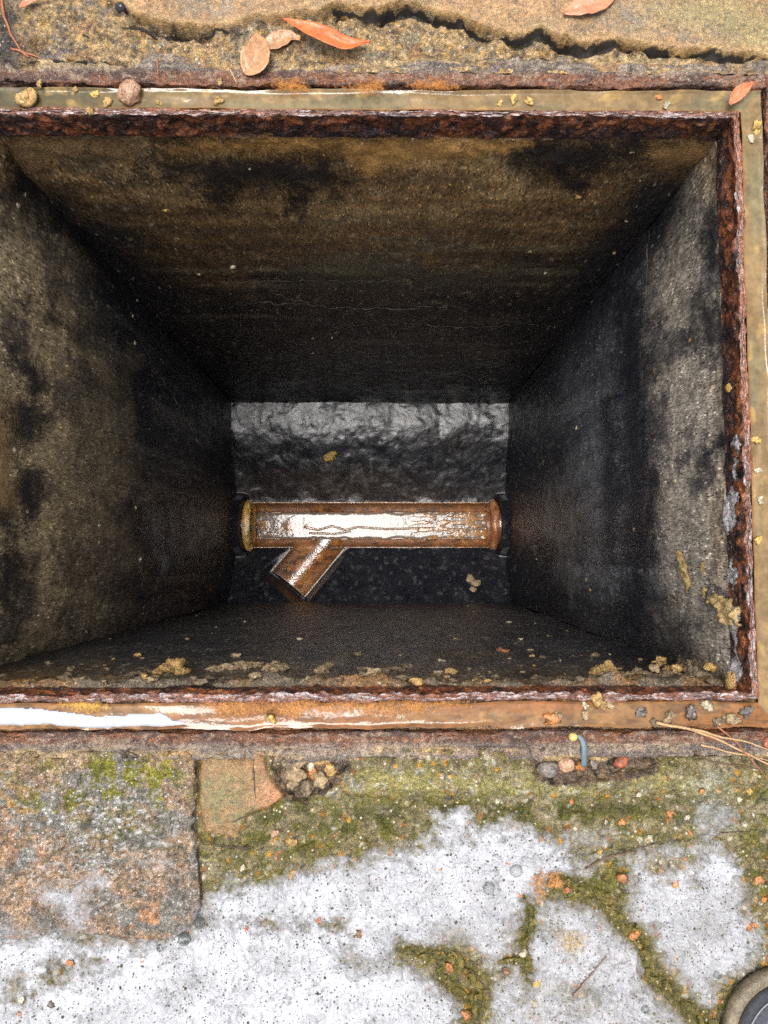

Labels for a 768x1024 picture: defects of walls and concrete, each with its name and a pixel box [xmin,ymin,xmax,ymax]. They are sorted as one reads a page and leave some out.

crack [123,26,241,43]
crack [332,6,768,64]
rust [275,78,307,91]
water stain [133,137,357,224]
water stain [497,125,650,196]
water stain [4,156,131,300]
water stain [0,344,56,621]
rust [59,698,111,713]
rust [200,699,472,720]